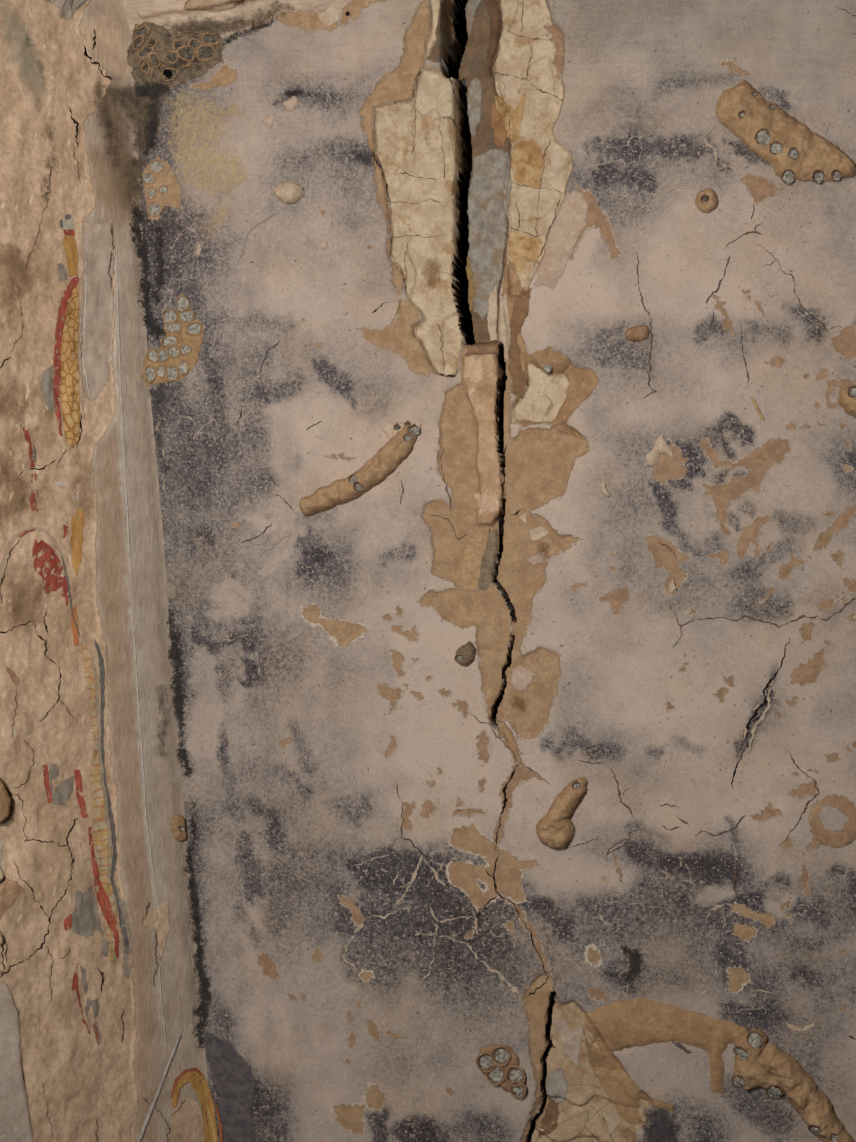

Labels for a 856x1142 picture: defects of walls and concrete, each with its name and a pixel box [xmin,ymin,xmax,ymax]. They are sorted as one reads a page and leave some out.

damp [126,82,159,216]
peeling [740,172,784,206]
damp [151,227,167,305]
flaking render [0,0,206,1142]
crack [298,0,556,1142]
flaking render [356,0,650,1142]
peeling [645,532,689,597]
crack [669,598,856,787]
damp [187,803,198,854]
crack [567,760,744,856]
crack [784,750,819,841]
peeling [725,965,751,994]